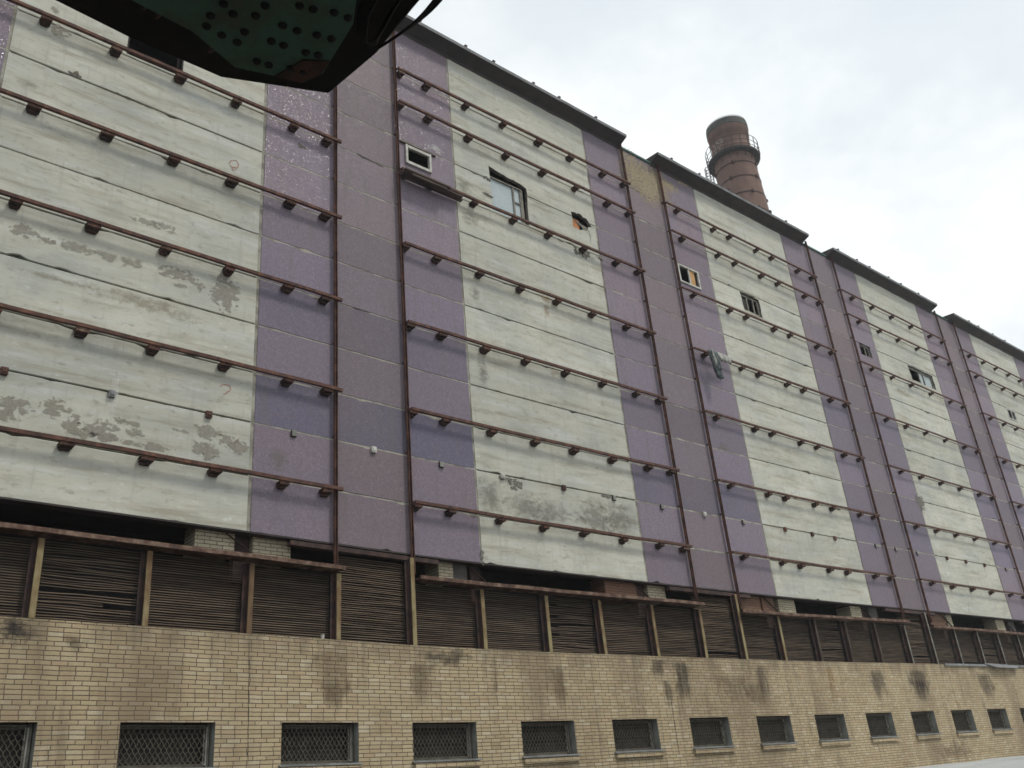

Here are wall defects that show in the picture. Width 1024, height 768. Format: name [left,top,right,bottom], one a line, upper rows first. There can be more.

peeling [9,223,142,267]
peeling [159,265,241,313]
peeling [0,396,176,452]
peeling [173,424,249,460]